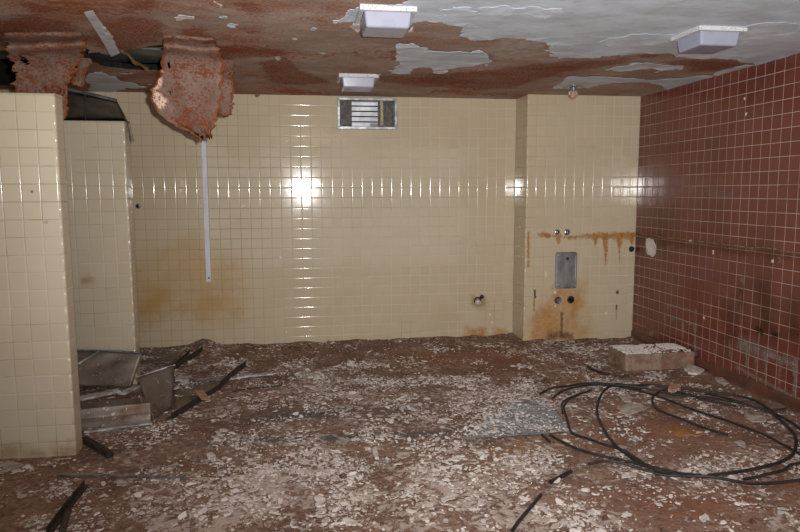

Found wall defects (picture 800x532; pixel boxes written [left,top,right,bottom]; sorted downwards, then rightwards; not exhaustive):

peeling [333,4,374,24]
peeling [388,0,800,90]
peeling [85,72,153,93]
rust [539,233,636,261]